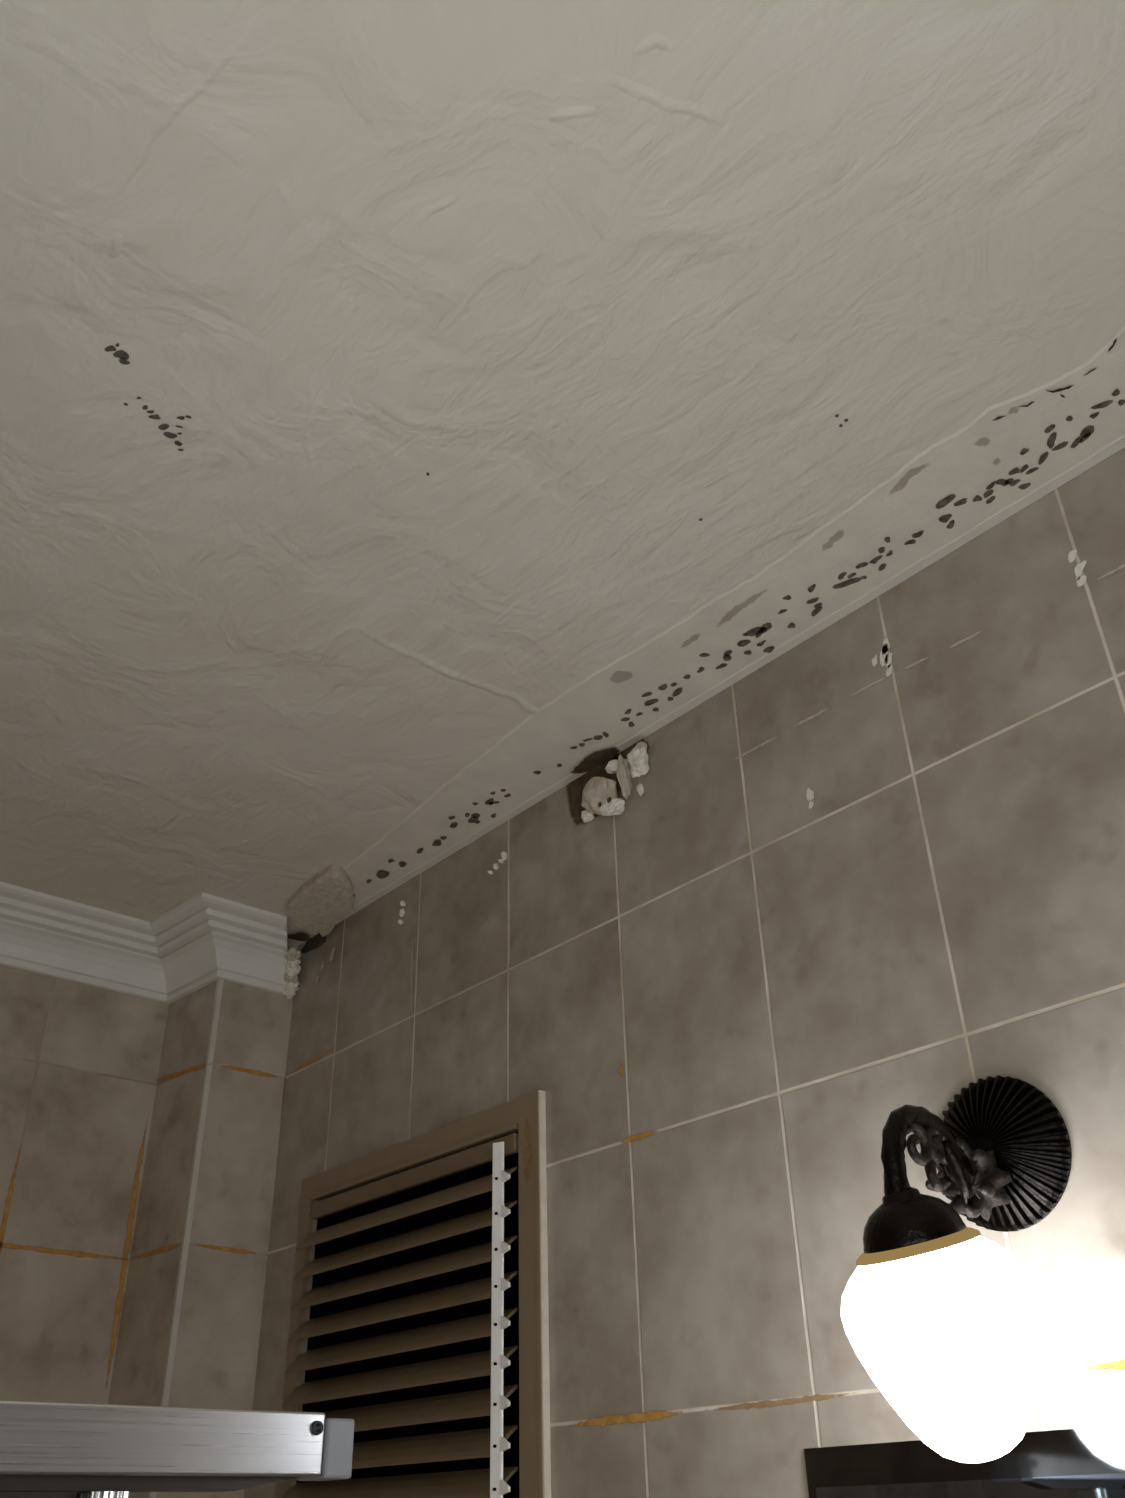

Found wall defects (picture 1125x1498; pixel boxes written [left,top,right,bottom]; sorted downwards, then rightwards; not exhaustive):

flaking render [282,326,1125,999]
crack [992,339,1117,421]